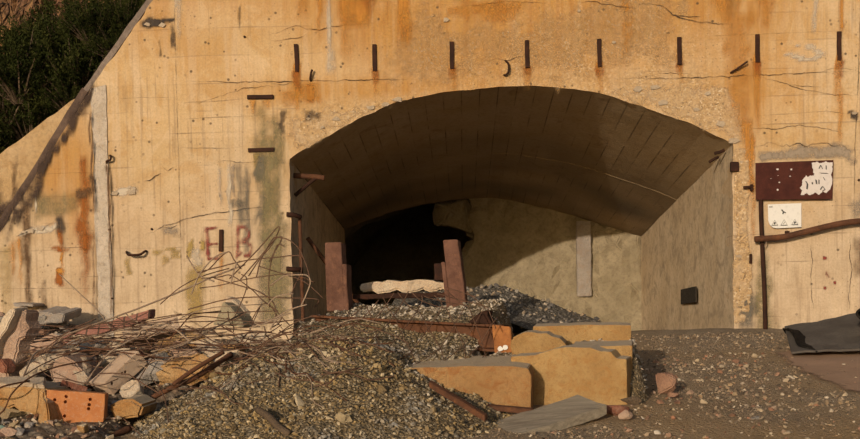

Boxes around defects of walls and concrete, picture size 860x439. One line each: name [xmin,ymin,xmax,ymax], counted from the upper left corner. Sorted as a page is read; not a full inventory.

spalling [142,17,174,28]
crack [658,5,717,24]
crack [219,79,383,91]
corrosion [293,64,319,101]
corrosion [76,115,95,311]
leakage [220,112,289,319]
corrosion [53,217,65,286]